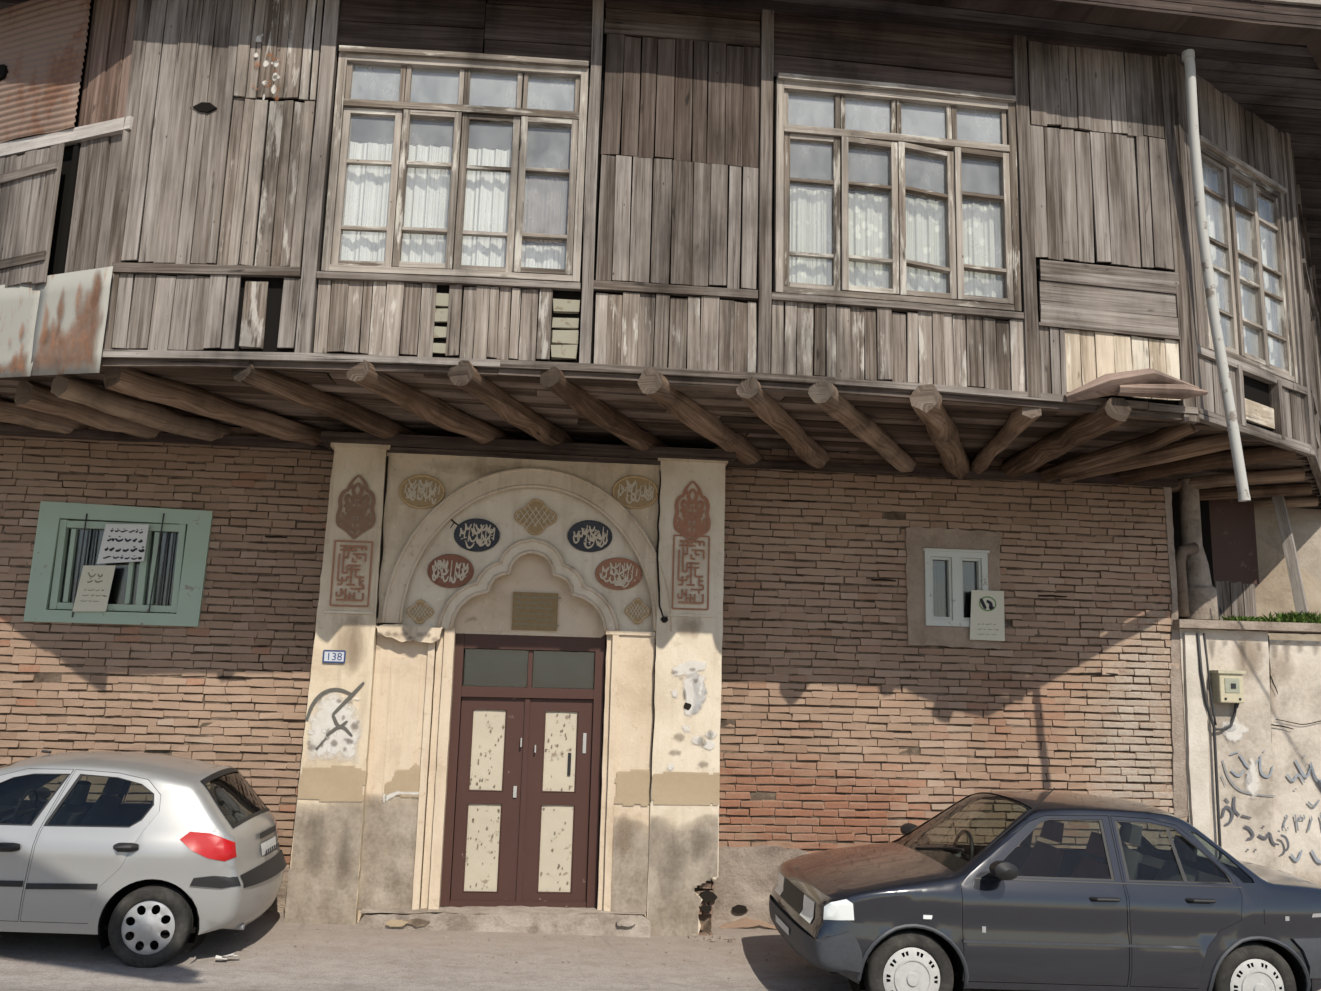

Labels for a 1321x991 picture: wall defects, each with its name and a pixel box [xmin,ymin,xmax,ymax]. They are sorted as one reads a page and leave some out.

corrosion [0,273,100,371]
peeling [305,682,364,760]
peeling [672,660,717,750]
water stain [284,764,420,925]
water stain [611,818,718,937]
spalling [689,876,736,943]
water stain [736,772,887,833]